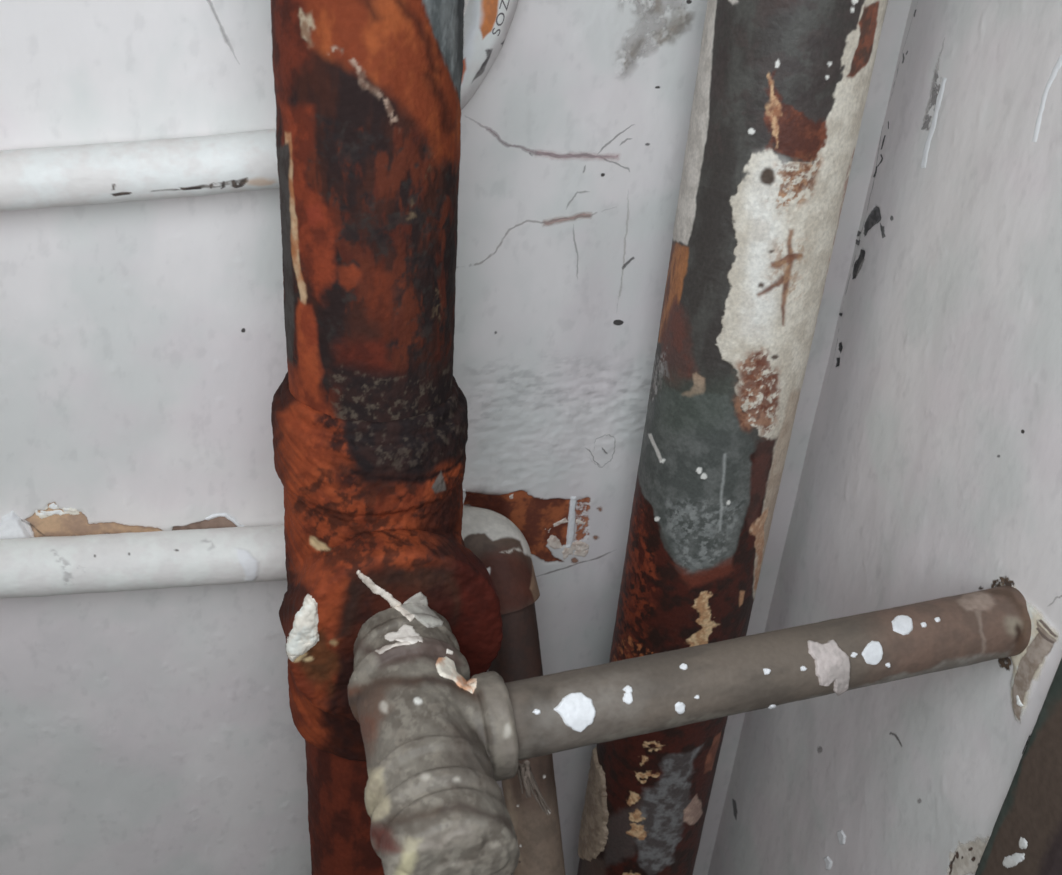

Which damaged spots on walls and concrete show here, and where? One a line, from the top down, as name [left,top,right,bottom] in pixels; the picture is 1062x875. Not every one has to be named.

crack [545,214,590,224]
peeling [21,502,244,537]
peeling [463,489,601,563]
peeling [1013,622,1056,720]